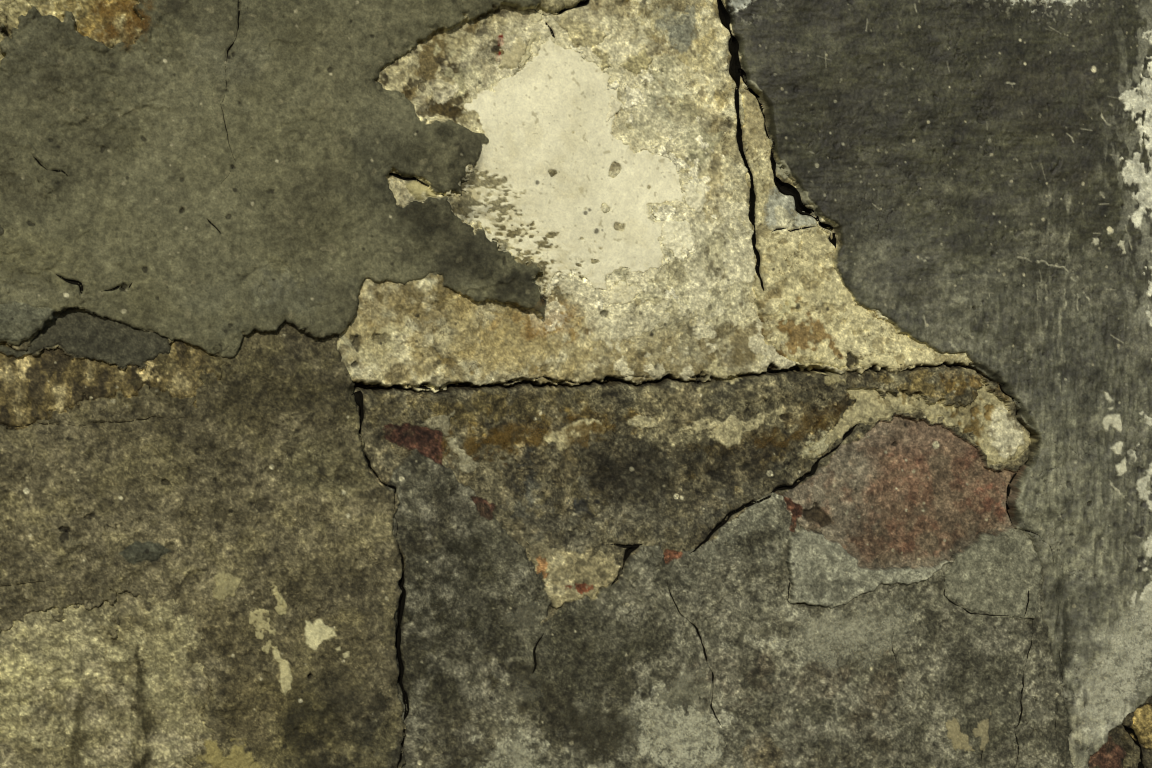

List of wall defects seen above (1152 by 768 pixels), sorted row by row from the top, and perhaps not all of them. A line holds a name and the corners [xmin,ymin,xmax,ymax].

spalling [0,0,142,61]
crack [221,0,240,181]
crack [534,0,589,38]
crack [717,0,836,291]
spalling [0,307,230,429]
spalling [336,0,1031,623]
crack [351,375,734,768]
crack [691,424,864,553]